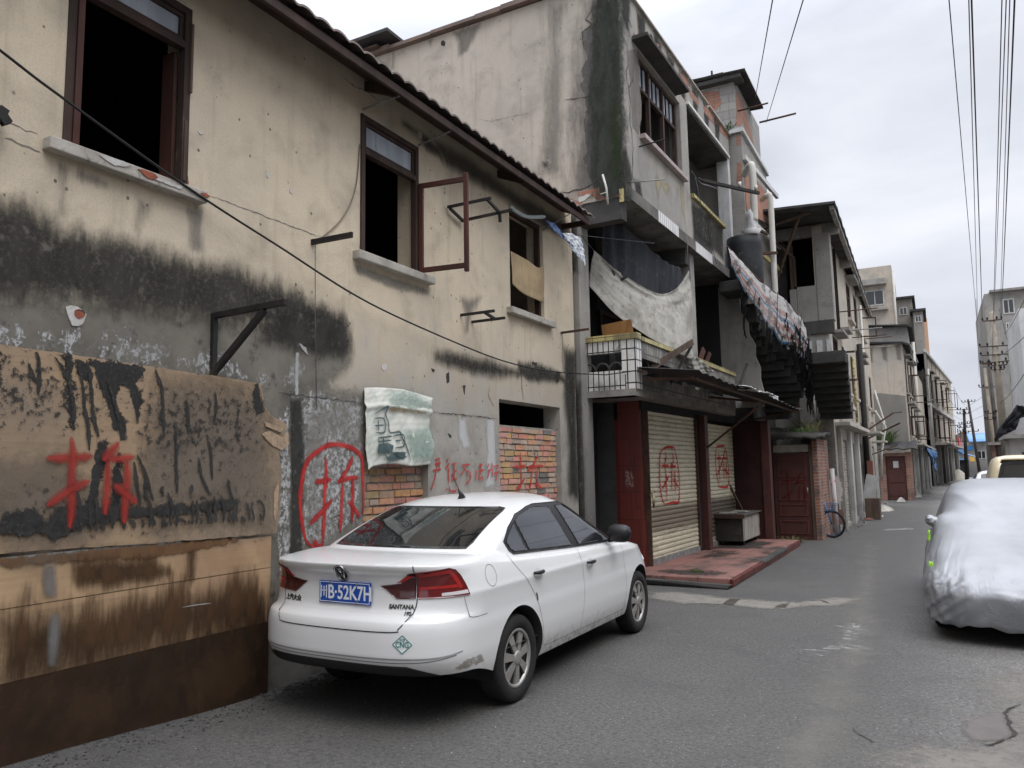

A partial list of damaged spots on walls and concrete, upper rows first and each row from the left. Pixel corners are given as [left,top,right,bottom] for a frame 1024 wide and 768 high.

water stain [588,0,632,201]
water stain [191,211,201,248]
crack [211,196,321,237]
peeling [0,314,25,347]
flaking render [37,305,86,355]
peeling [100,327,163,368]
peeling [177,348,265,385]
water stain [0,294,367,765]